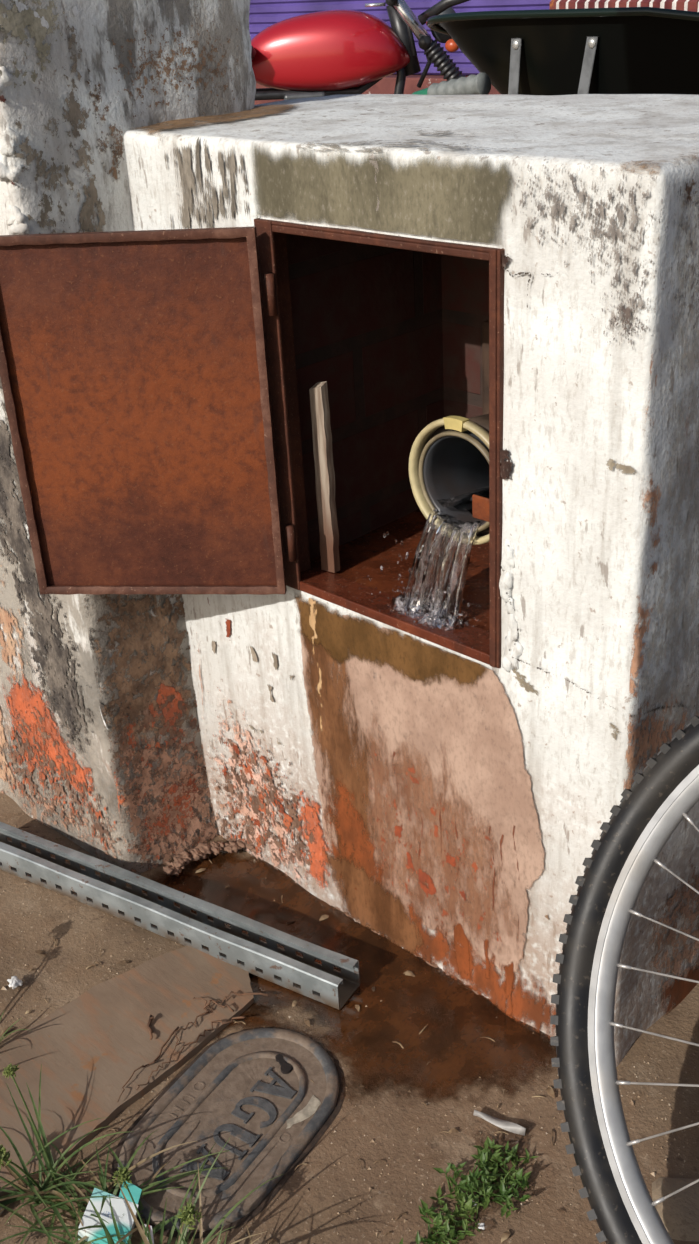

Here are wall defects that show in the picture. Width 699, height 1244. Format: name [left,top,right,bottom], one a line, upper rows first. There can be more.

peeling [0,0,124,234]
leakage [160,128,699,352]
peeling [0,378,197,807]
spalling [629,596,653,697]
spalling [642,478,662,547]
corrosion [0,633,556,1035]